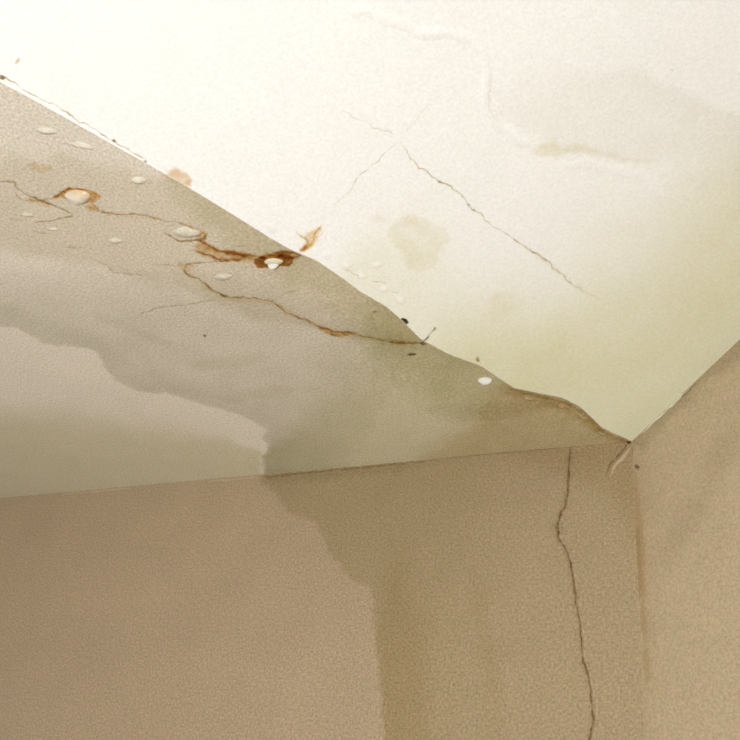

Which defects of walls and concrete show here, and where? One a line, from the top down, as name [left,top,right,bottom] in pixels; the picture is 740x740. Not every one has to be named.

crack [202,243,300,261]
rust [254,255,293,268]